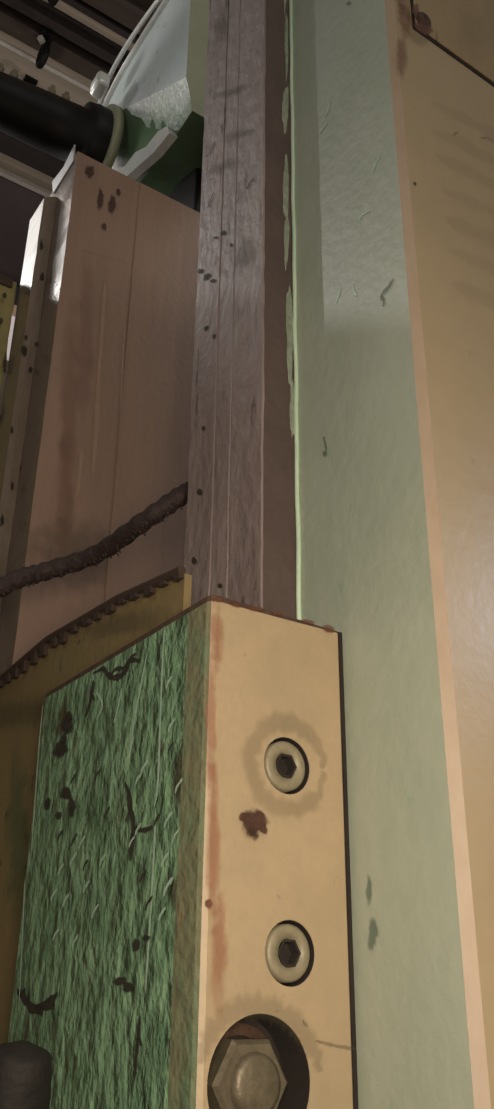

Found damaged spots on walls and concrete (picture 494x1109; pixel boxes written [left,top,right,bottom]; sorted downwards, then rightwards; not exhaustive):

peeling [93,653,141,681]
spalling [53,712,73,757]
peeling [44,773,106,893]
peeling [129,812,179,867]
peeling [145,877,173,921]
peeling [17,988,58,1016]
peeling [113,977,134,992]